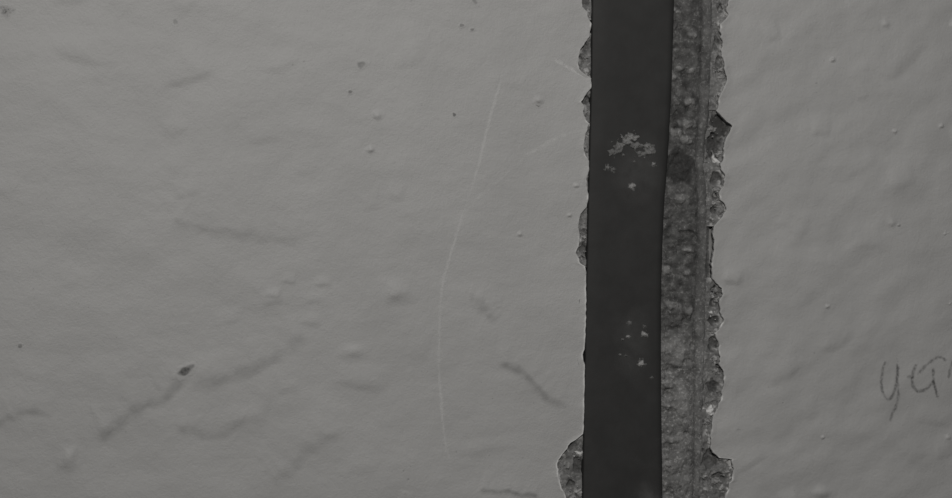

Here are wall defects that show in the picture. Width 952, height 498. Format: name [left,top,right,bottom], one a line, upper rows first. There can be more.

flaking render [582,0,591,20]
flaking render [578,33,591,77]
flaking render [581,90,590,158]
flaking render [703,0,732,226]
flaking render [576,207,587,267]
flaking render [699,278,733,498]
flaking render [557,434,583,498]